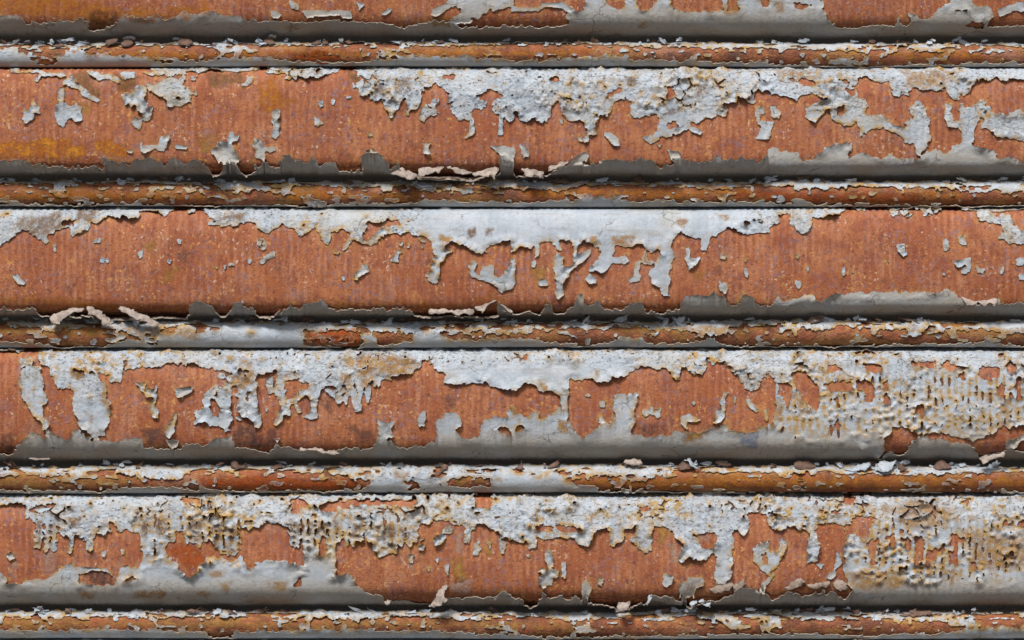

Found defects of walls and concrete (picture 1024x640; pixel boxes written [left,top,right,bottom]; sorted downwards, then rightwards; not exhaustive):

corrosion [75,72,99,113]
corrosion [0,137,127,159]
peeling [0,0,1024,299]
corrosion [0,191,202,221]
corrosion [518,185,960,202]
corrosion [20,214,60,234]
corrosion [306,329,417,386]
peeling [0,280,1024,640]
corrosion [899,502,949,526]
corrosion [172,520,236,569]
corrosion [964,532,1024,566]